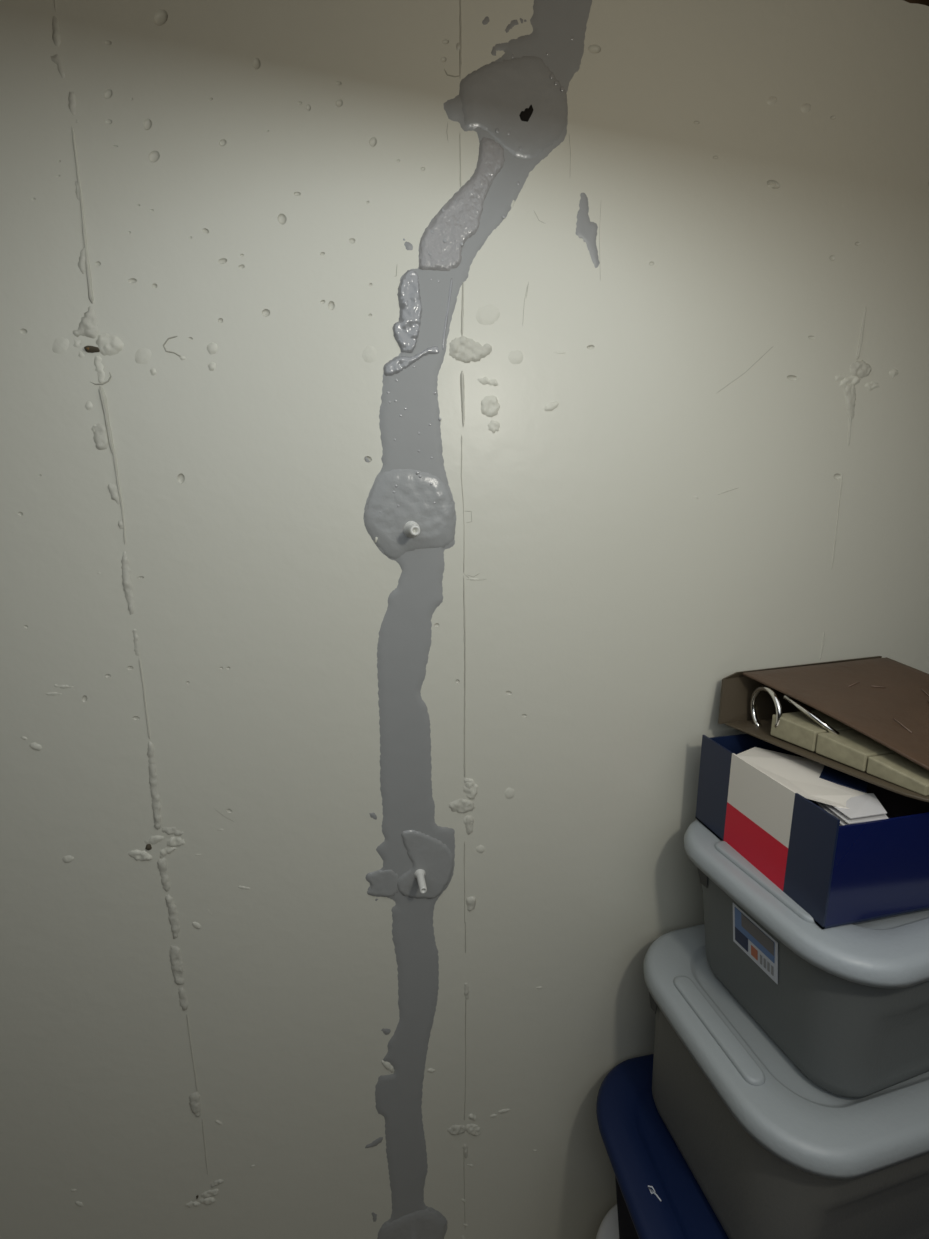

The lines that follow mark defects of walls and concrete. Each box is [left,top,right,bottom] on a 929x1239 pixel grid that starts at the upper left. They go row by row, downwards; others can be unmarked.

crack [72,127,94,303]
crack [163,336,180,357]
crack [91,372,126,544]
crack [363,0,592,1239]